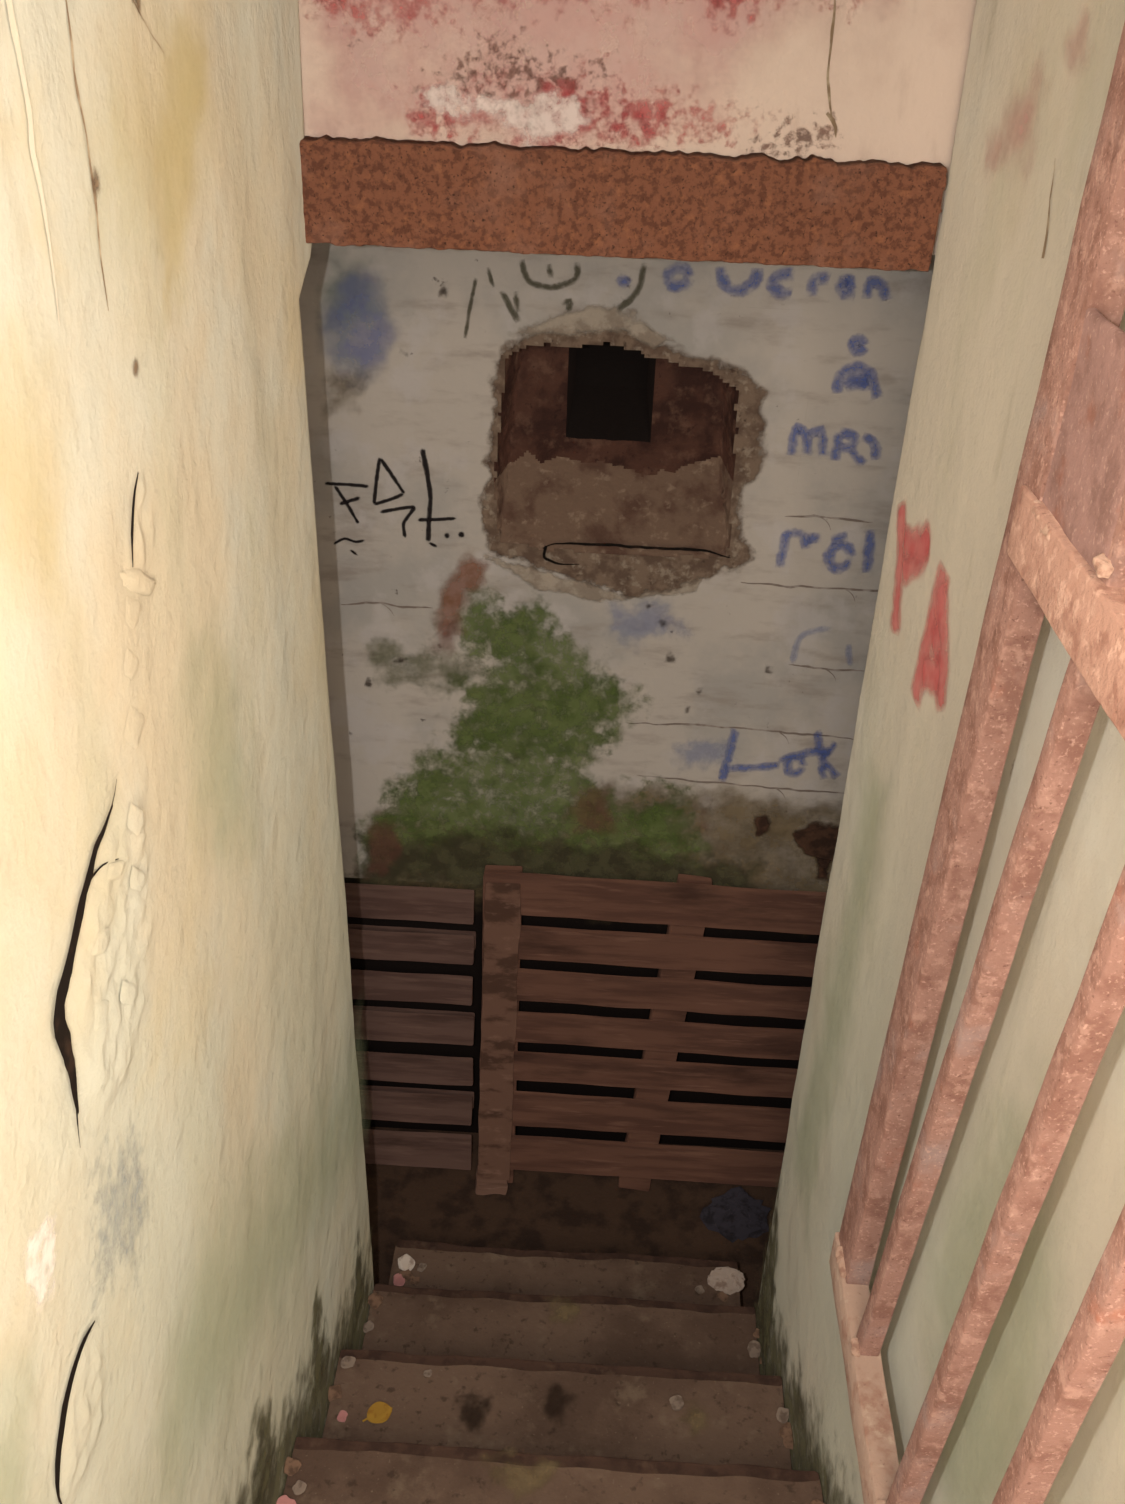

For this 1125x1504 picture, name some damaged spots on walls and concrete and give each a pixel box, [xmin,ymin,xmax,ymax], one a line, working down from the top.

crack [131,473,139,567]
spalling [480,306,768,601]
crack [53,779,119,1148]
crack [55,1321,95,1504]